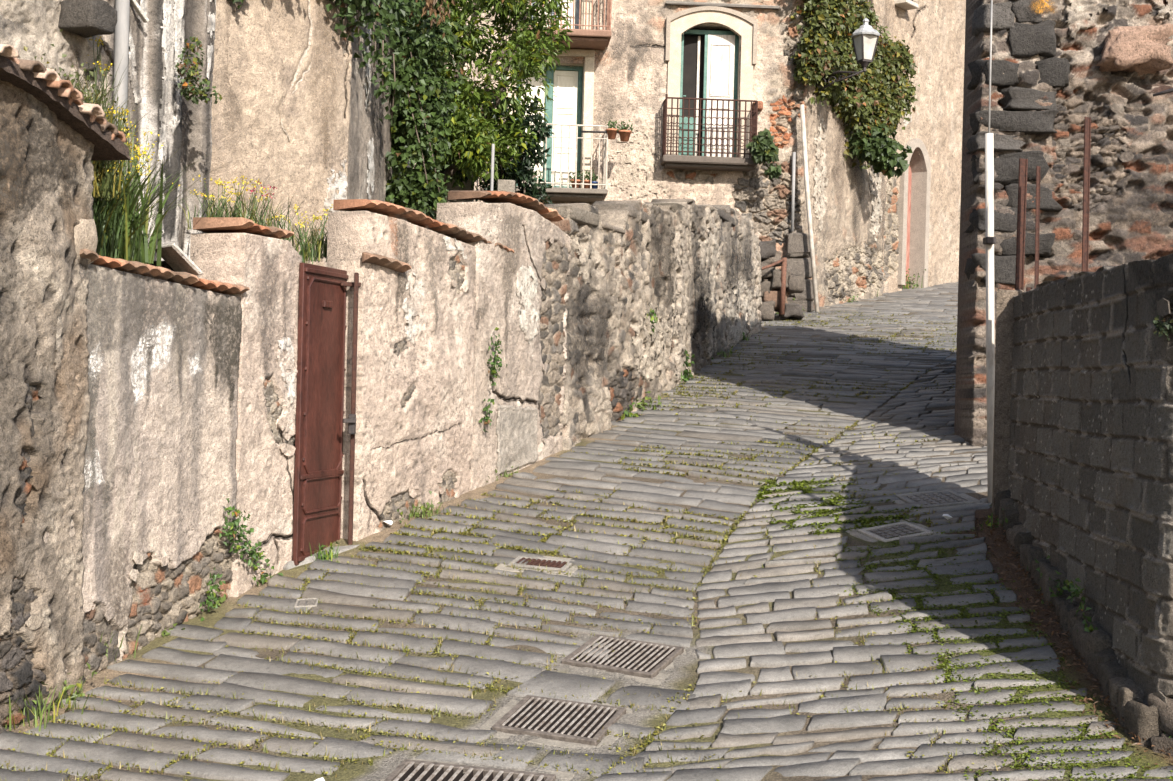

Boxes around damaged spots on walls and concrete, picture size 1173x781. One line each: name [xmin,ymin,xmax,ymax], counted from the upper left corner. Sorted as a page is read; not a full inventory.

crack [279,0,313,144]
spalling [731,4,829,246]
spalling [14,449,45,523]
spalling [25,383,45,437]
water stain [80,269,190,509]
water stain [205,302,242,414]
crack [254,534,293,564]
crack [362,479,382,526]
crack [371,423,460,450]
crack [490,377,541,416]
spalling [0,577,50,734]
spalling [82,528,235,683]